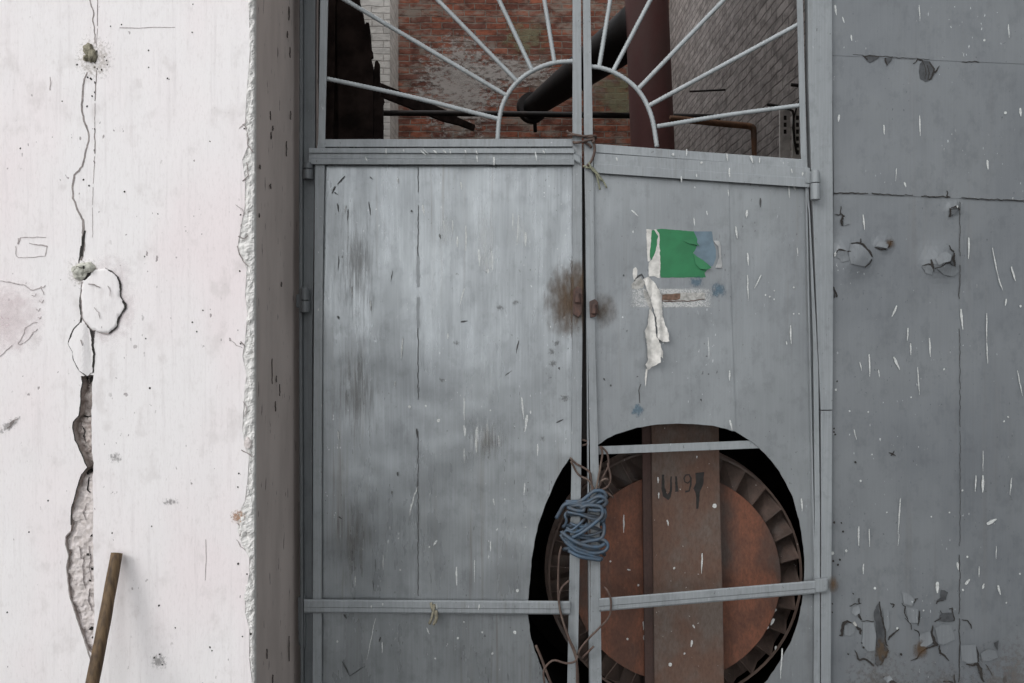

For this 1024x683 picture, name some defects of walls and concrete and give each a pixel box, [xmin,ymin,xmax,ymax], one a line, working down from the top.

peeling [863,56,893,65]
peeling [913,59,939,82]
crack [71,0,98,322]
peeling [839,590,1007,683]